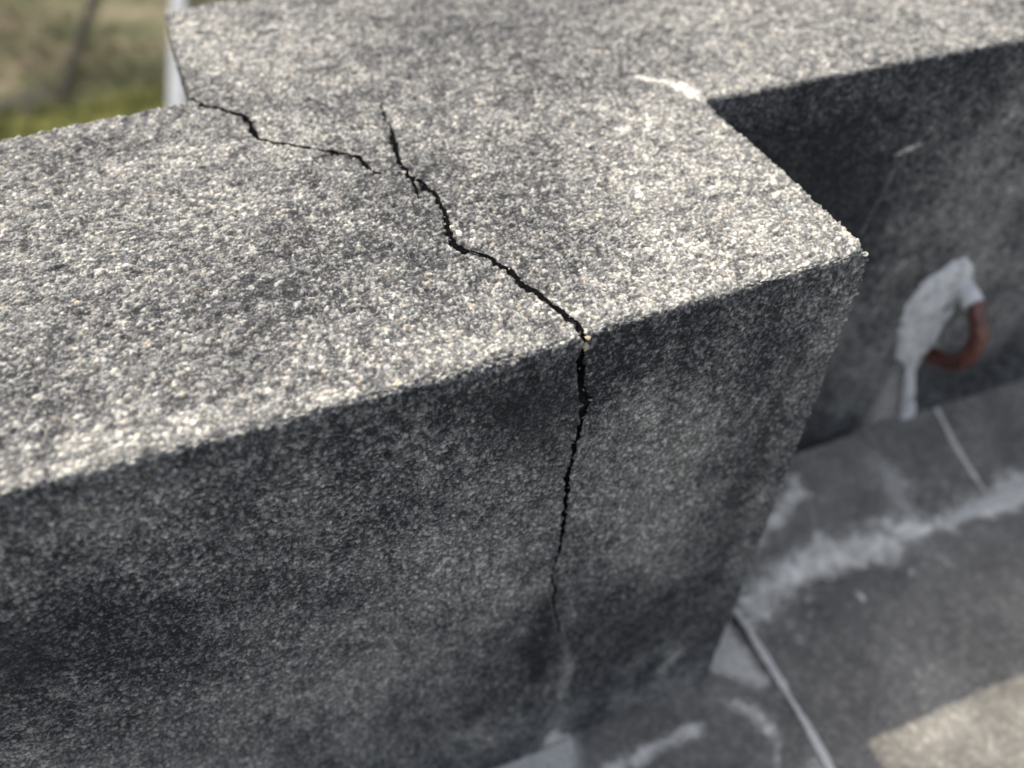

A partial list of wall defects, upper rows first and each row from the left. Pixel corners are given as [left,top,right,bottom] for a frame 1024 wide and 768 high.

crack [190,97,592,670]
leakage [731,465,1024,668]